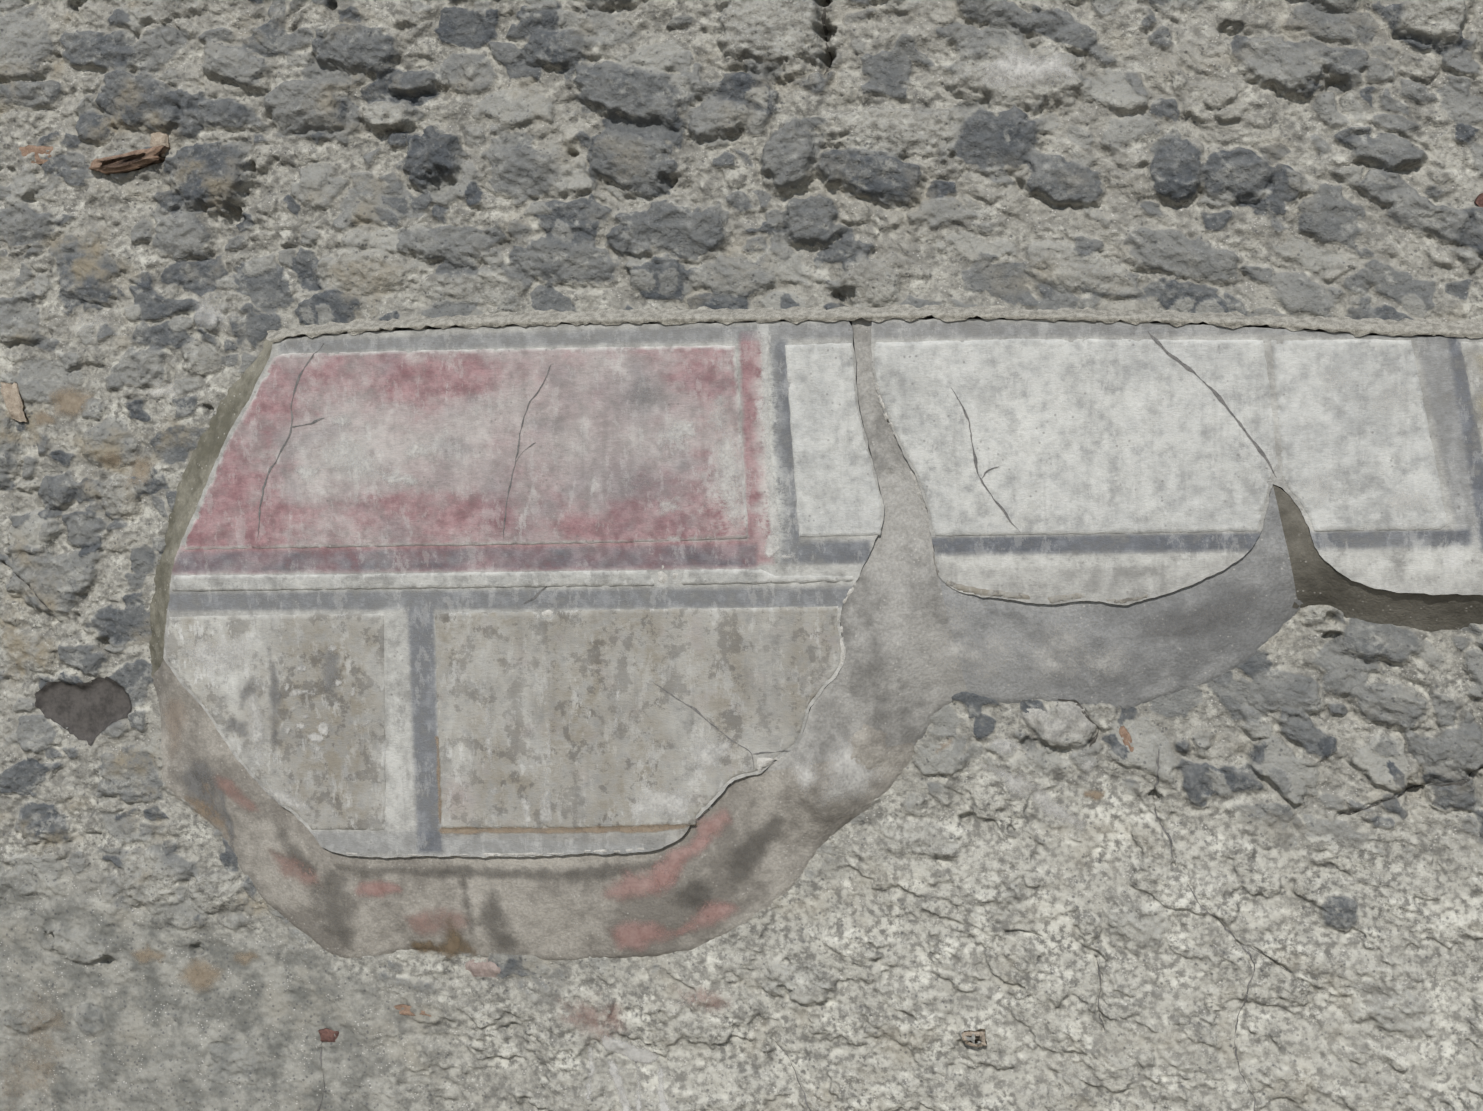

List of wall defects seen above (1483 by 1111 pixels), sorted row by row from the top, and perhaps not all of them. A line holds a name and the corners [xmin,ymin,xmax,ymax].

crack [258,343,324,533]
crack [503,365,551,538]
crack [951,388,1020,532]
crack [1148,332,1277,478]
spalling [837,576,860,666]
peeling [285,667,328,751]
peeling [634,793,712,824]
spalling [757,756,783,773]
crack [1338,766,1483,816]
crack [1153,750,1292,1111]
crack [1096,957,1105,1030]